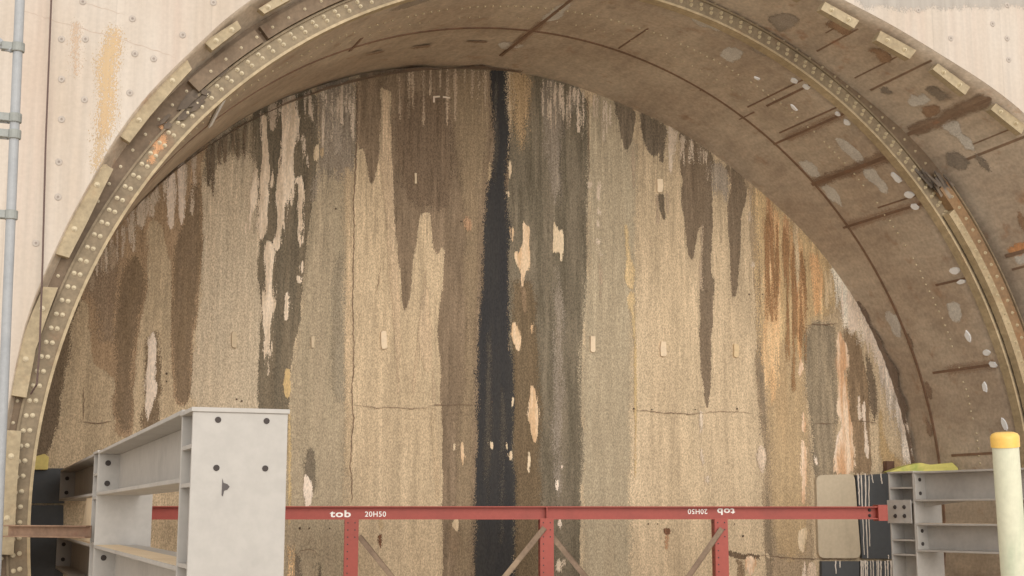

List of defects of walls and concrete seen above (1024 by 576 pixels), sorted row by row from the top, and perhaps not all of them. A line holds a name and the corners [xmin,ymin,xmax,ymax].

corrosion [145,122,168,164]
corrosion [907,92,992,138]
spalling [553,222,564,261]
crack [349,84,472,499]
damp [36,67,913,506]
corrosion [744,186,840,506]
spalling [526,385,540,472]
damp [284,519,344,576]
damp [554,519,636,576]
damp [762,519,815,576]
corrosion [770,519,815,565]